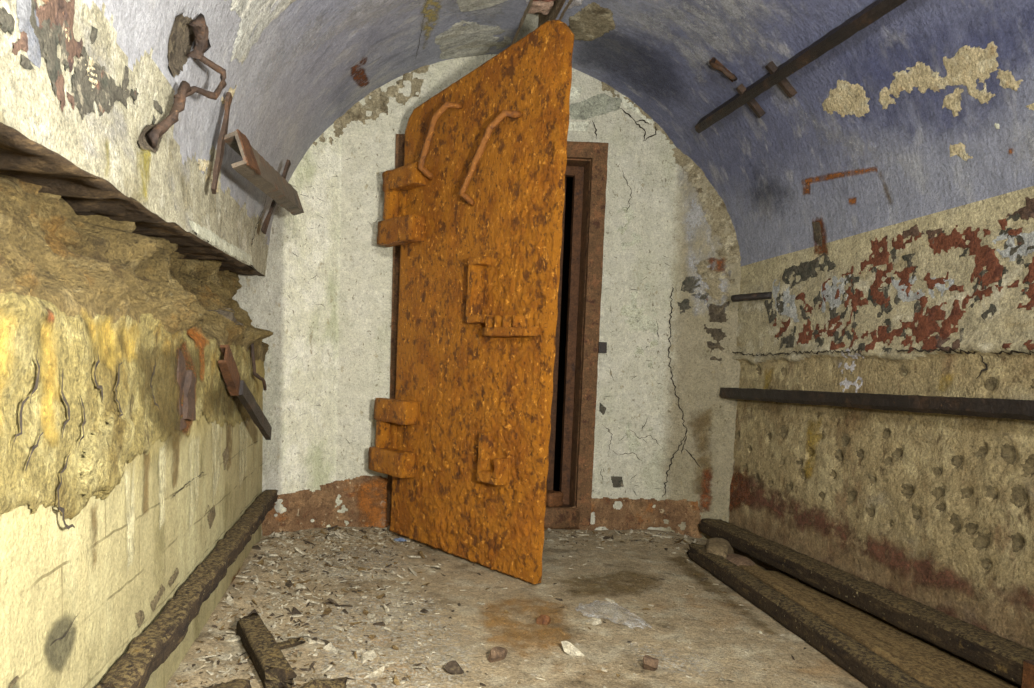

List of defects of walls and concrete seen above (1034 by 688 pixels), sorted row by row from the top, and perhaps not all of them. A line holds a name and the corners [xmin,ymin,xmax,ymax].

peeling [0,0,139,120]
spalling [167,13,195,78]
peeling [224,0,296,65]
peeling [435,0,511,59]
peeling [822,41,1023,118]
peeling [764,197,1034,359]
crack [14,346,124,471]
spalling [0,174,273,520]
crack [600,256,701,497]
water stain [729,466,750,512]
spalling [135,568,179,627]
water stain [46,618,76,670]